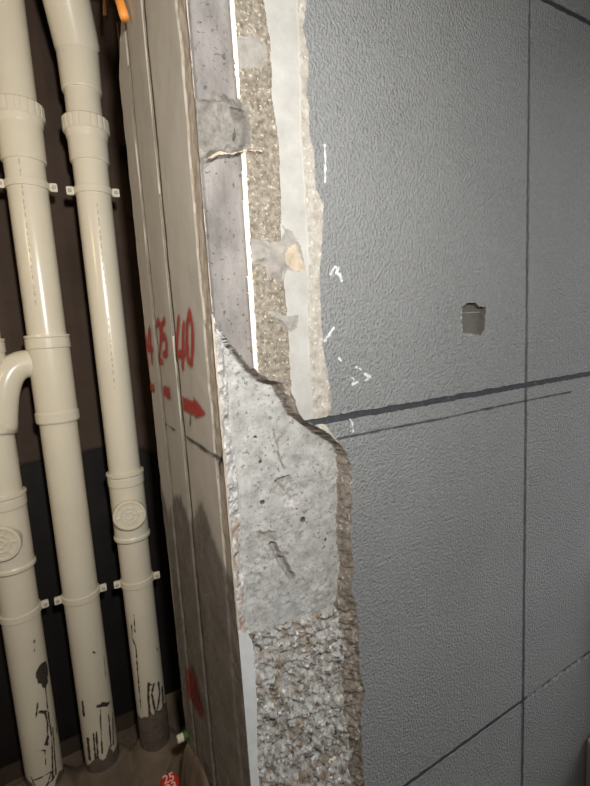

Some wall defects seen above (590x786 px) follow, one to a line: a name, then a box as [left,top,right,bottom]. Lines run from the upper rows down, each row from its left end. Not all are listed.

flaking render [186,0,365,786]
spalling [461,303,486,336]